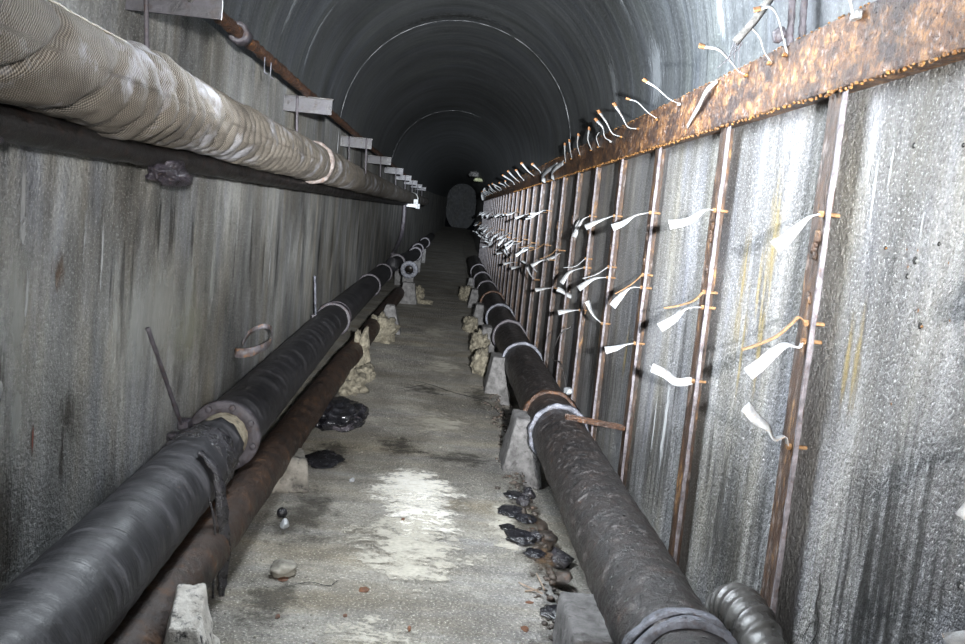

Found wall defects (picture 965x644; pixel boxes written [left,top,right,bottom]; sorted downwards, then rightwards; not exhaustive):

leakage [240,585,294,623]